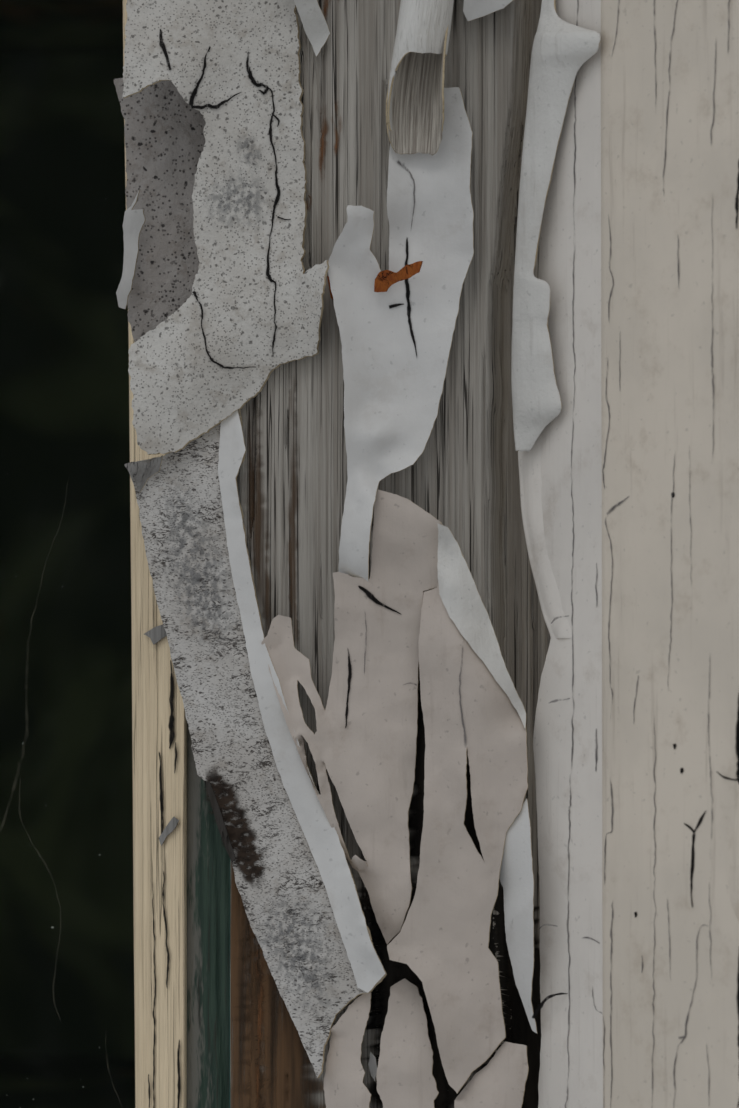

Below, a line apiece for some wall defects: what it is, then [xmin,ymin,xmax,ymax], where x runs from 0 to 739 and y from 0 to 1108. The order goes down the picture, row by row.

crack [159,29,171,70]
crack [192,291,249,369]
crack [189,46,291,354]
peeling [114,0,537,1108]
crack [345,586,401,728]
crack [389,238,417,357]
crack [570,260,578,394]
crack [571,77,579,195]
crack [549,361,639,882]
crack [667,161,739,682]
crack [532,791,613,1108]
crack [641,659,739,1094]